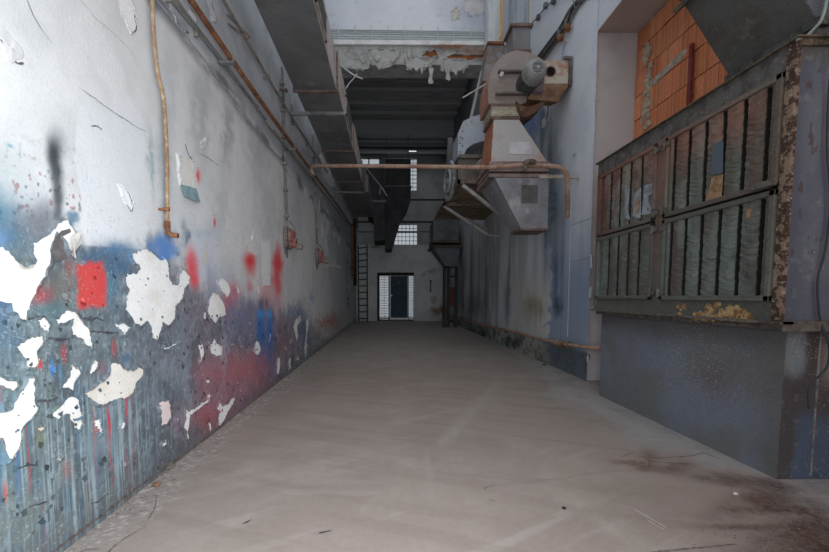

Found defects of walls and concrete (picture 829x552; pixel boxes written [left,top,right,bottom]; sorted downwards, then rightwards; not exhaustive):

peeling [118,0,137,36]
peeling [335,47,483,84]
peeling [0,215,334,483]
peeling [2,491,76,535]